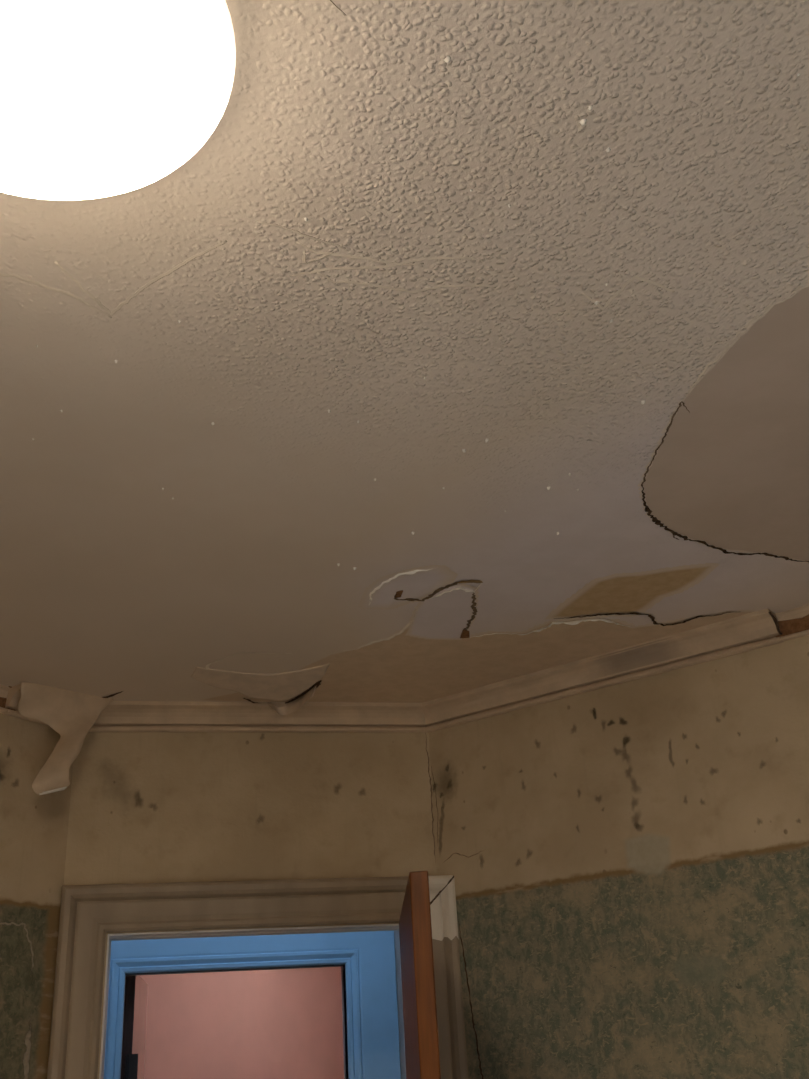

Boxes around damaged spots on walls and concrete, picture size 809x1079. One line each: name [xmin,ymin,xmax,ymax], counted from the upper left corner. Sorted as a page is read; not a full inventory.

crack [328,0,346,16]
flaking render [528,563,720,634]
flaking render [769,612,809,637]